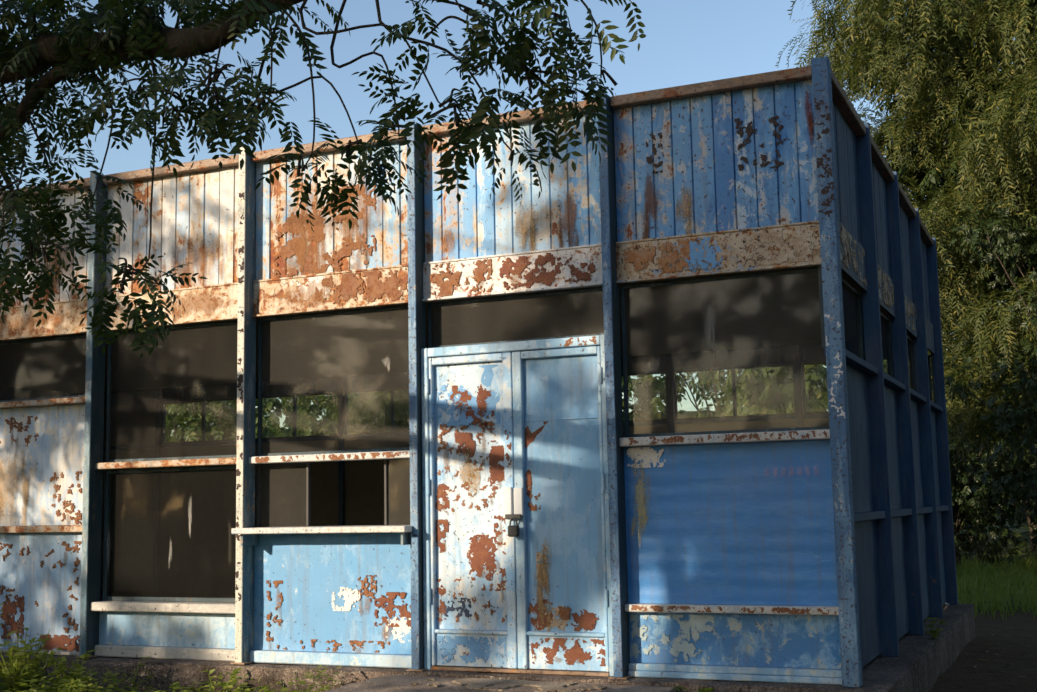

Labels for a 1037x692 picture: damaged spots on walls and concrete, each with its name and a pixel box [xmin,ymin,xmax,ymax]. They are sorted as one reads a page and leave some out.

peeling [525,421,548,448]
rust [0,459,29,526]
peeling [436,364,512,623]
peeling [526,469,541,511]
damp [632,470,648,540]
peeling [266,580,287,650]
peeling [300,575,411,653]
peeling [437,636,506,664]
rust [537,546,550,632]
peeling [528,599,606,666]
peeling [630,605,723,662]
spalling [410,678,607,692]